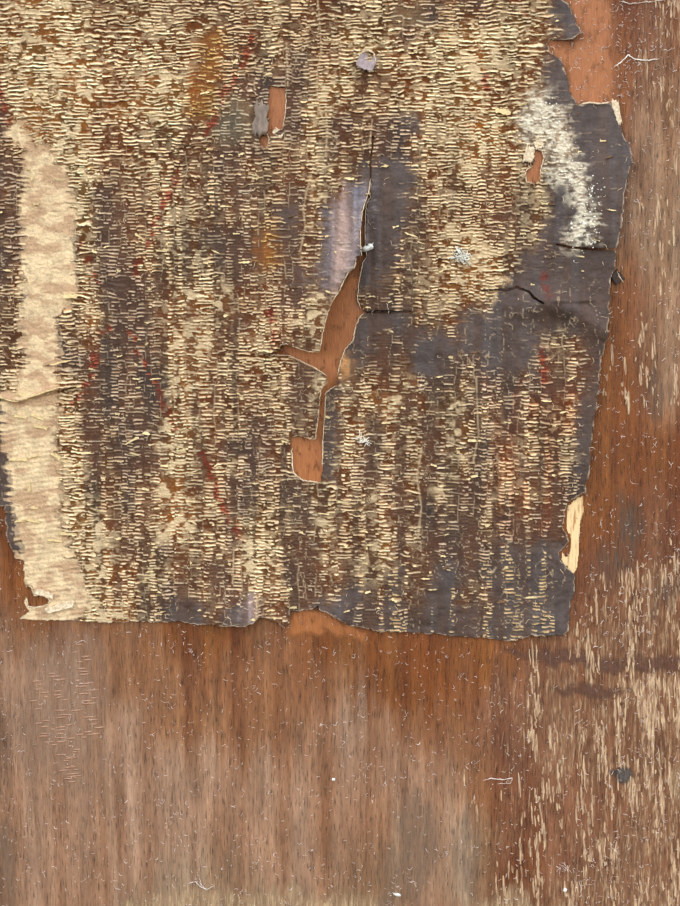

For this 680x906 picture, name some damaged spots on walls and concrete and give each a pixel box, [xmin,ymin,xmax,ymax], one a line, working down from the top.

peeling [356,35,396,71]
peeling [550,0,616,115]
peeling [246,73,286,152]
peeling [514,137,546,184]
crack [364,307,411,315]
crack [483,287,543,304]
peeling [0,115,109,621]
crack [272,343,325,375]
peeling [280,274,375,484]
peeling [288,603,367,642]